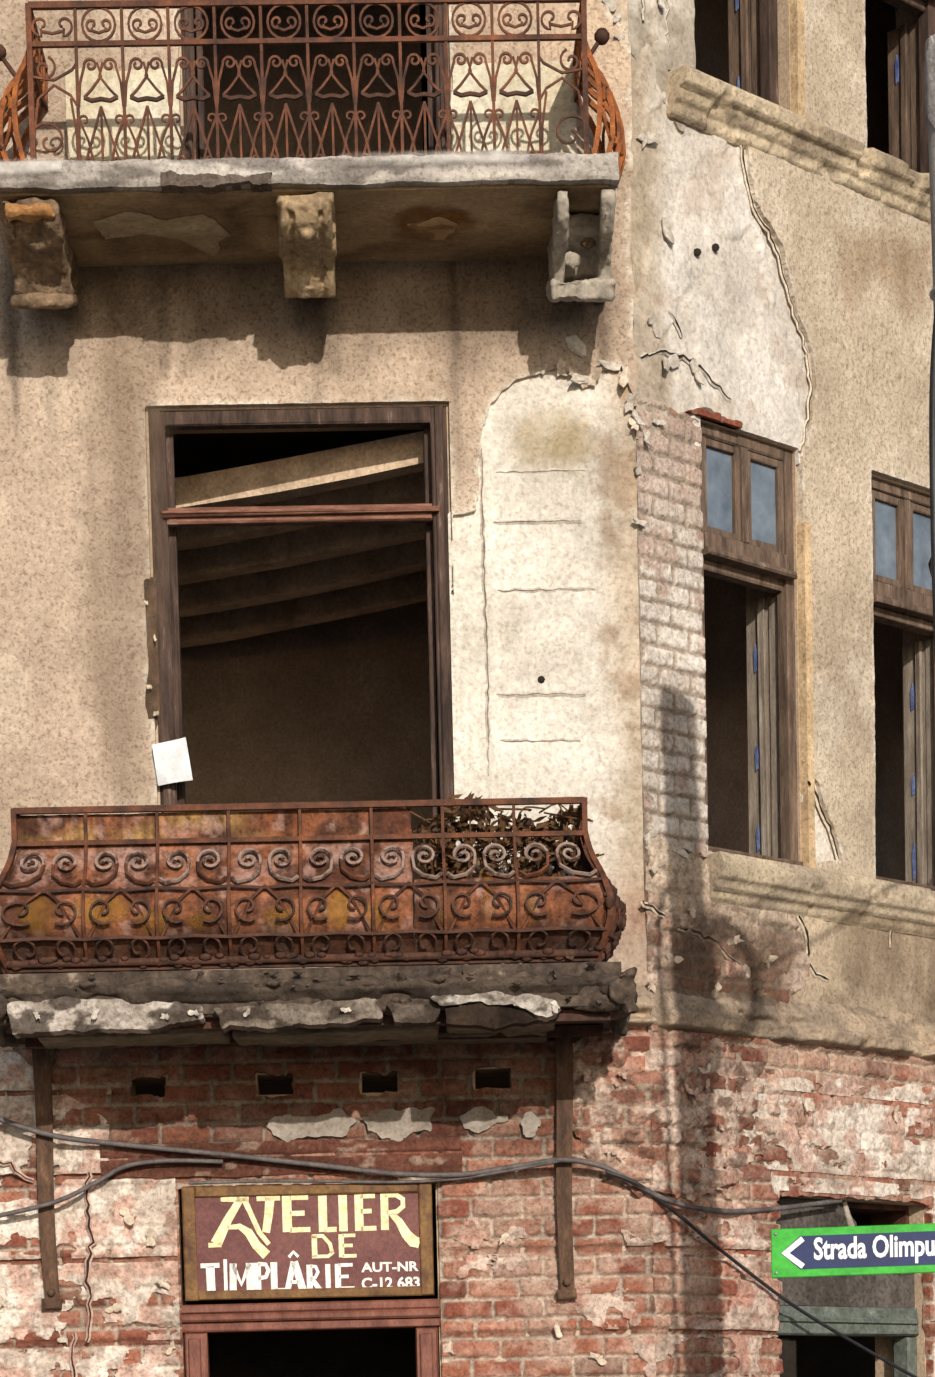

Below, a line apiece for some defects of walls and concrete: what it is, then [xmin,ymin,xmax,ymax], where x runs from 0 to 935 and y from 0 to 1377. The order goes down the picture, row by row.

spalling [160,170,272,195]
spalling [92,211,231,256]
spalling [407,217,458,240]
flaking render [448,0,935,1377]
crack [797,915,829,982]
peeling [0,991,561,1377]